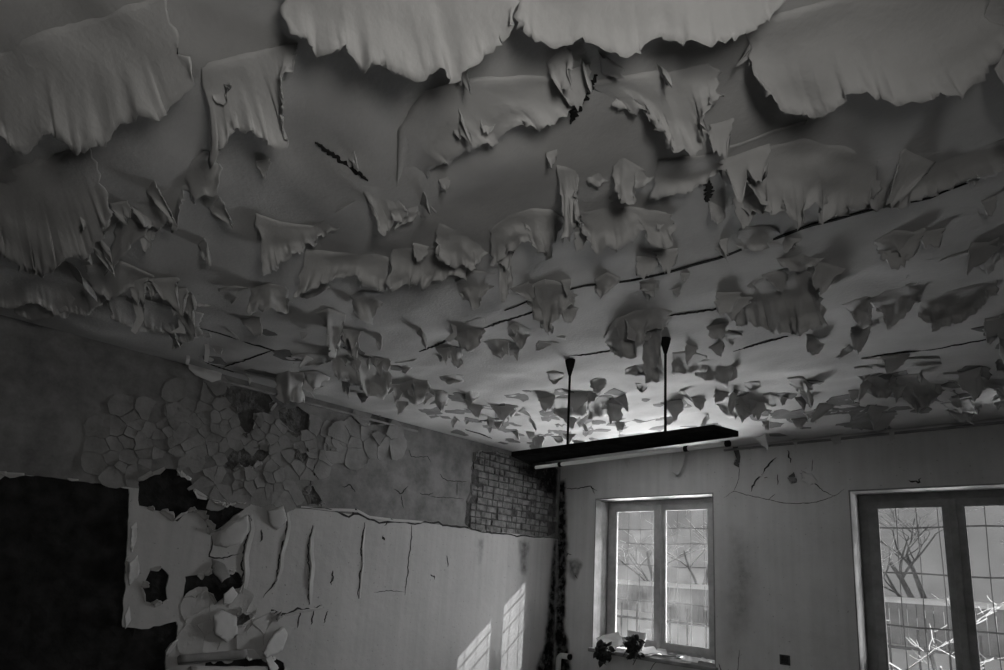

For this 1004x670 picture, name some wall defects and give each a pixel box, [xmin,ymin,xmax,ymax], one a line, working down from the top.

peeling [671,237,1004,450]
flaking render [0,308,707,670]
crack [209,451,577,628]
crack [724,451,844,504]